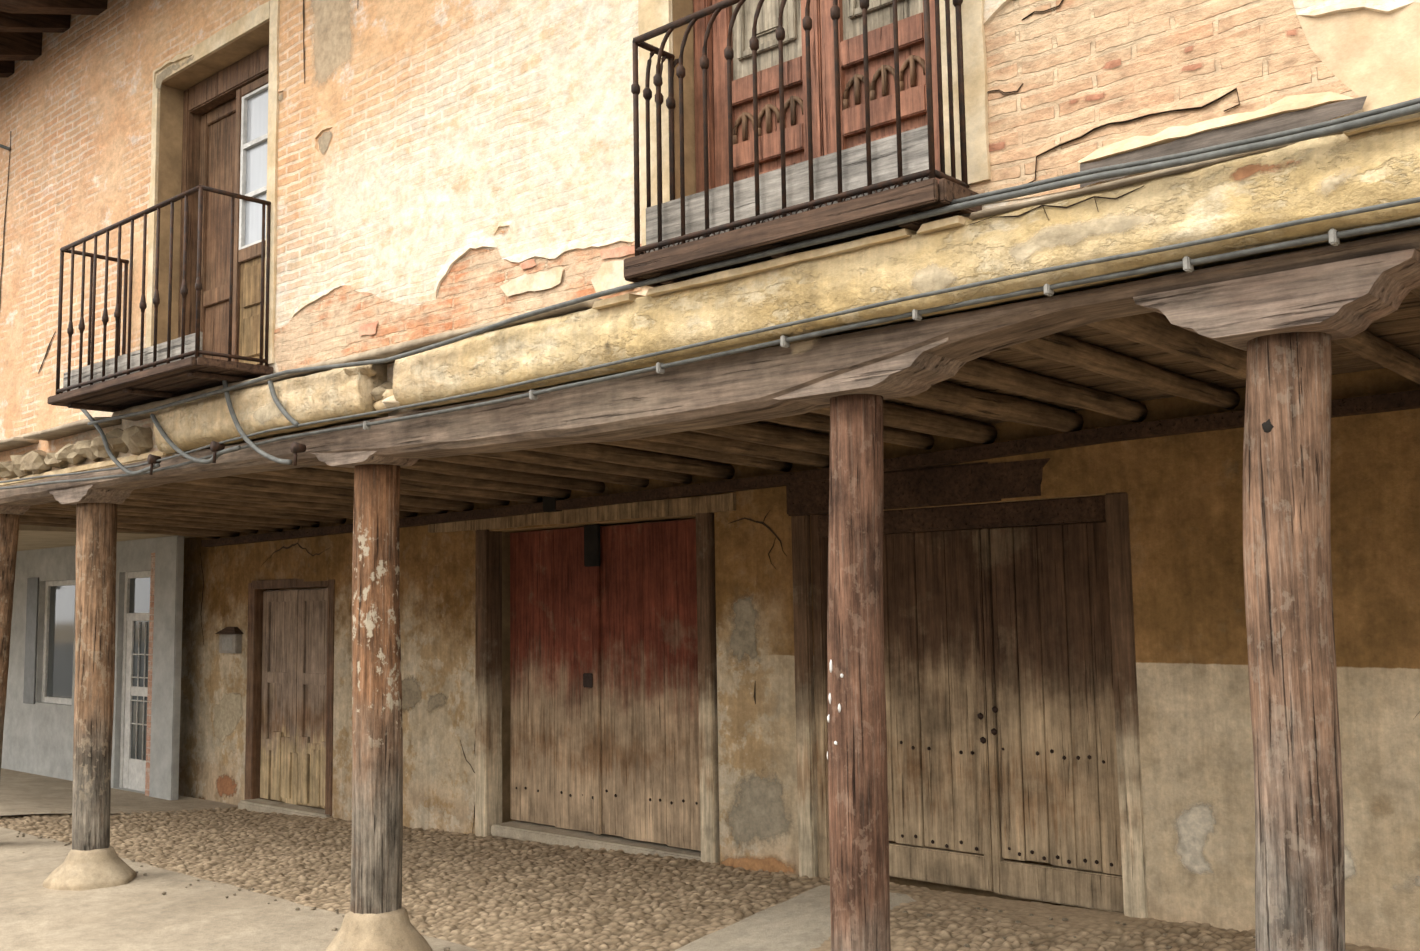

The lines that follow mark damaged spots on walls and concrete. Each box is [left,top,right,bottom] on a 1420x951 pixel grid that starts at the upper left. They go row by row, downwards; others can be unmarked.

flaking render [969,0,1420,202]
flaking render [274,221,641,372]